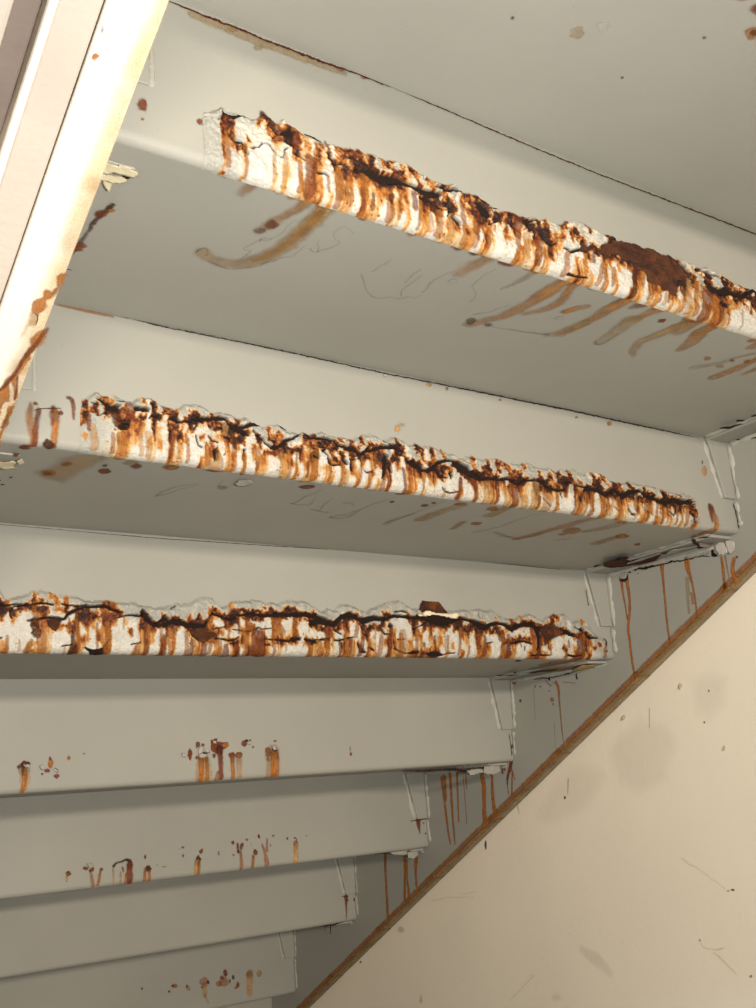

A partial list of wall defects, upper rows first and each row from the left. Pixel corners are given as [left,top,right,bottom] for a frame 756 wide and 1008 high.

crack [66,203,115,270]
peeling [101,163,139,192]
rust [238,197,333,266]
peeling [200,107,756,339]
rust [0,272,66,442]
crack [59,305,697,438]
rust [19,397,75,449]
peeling [77,392,735,581]
peeling [0,589,608,687]
rust [181,738,279,781]
rust [297,554,756,1008]
rust [83,855,152,887]